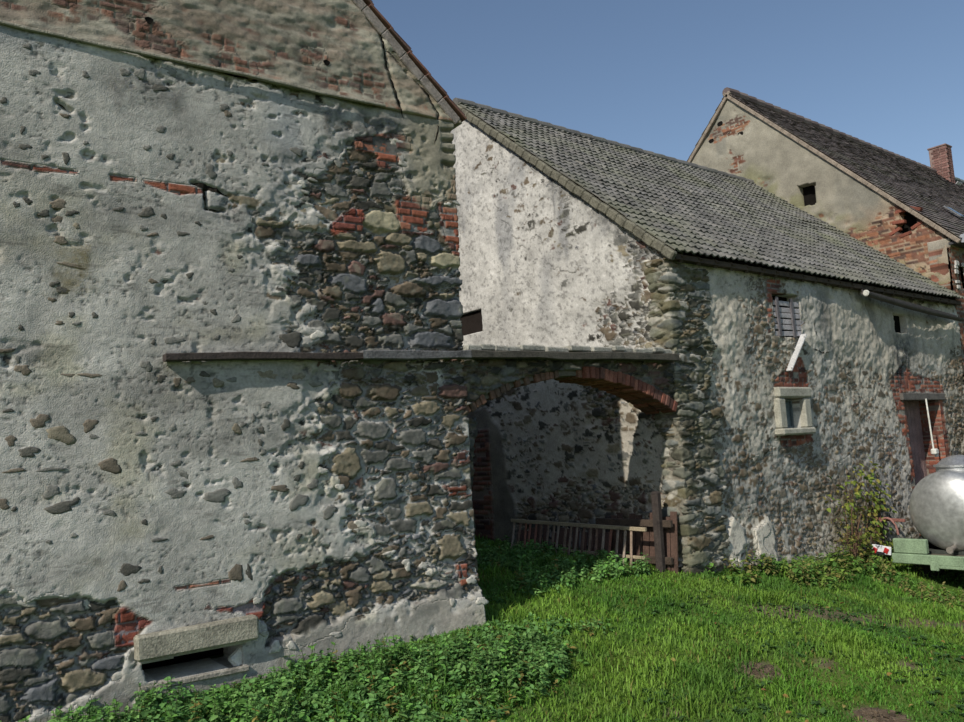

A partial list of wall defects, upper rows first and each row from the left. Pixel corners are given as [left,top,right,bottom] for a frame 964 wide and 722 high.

crack [369,21,440,145]
flaking render [709,112,744,143]
spalling [137,207,167,236]
flaking render [858,206,940,274]
spalling [597,240,665,347]
spalling [203,135,489,654]
spalling [587,386,621,420]
spalling [98,458,122,474]
spalling [157,460,190,499]
spalling [117,564,150,592]
flaking render [174,563,253,592]
spalling [0,589,149,722]